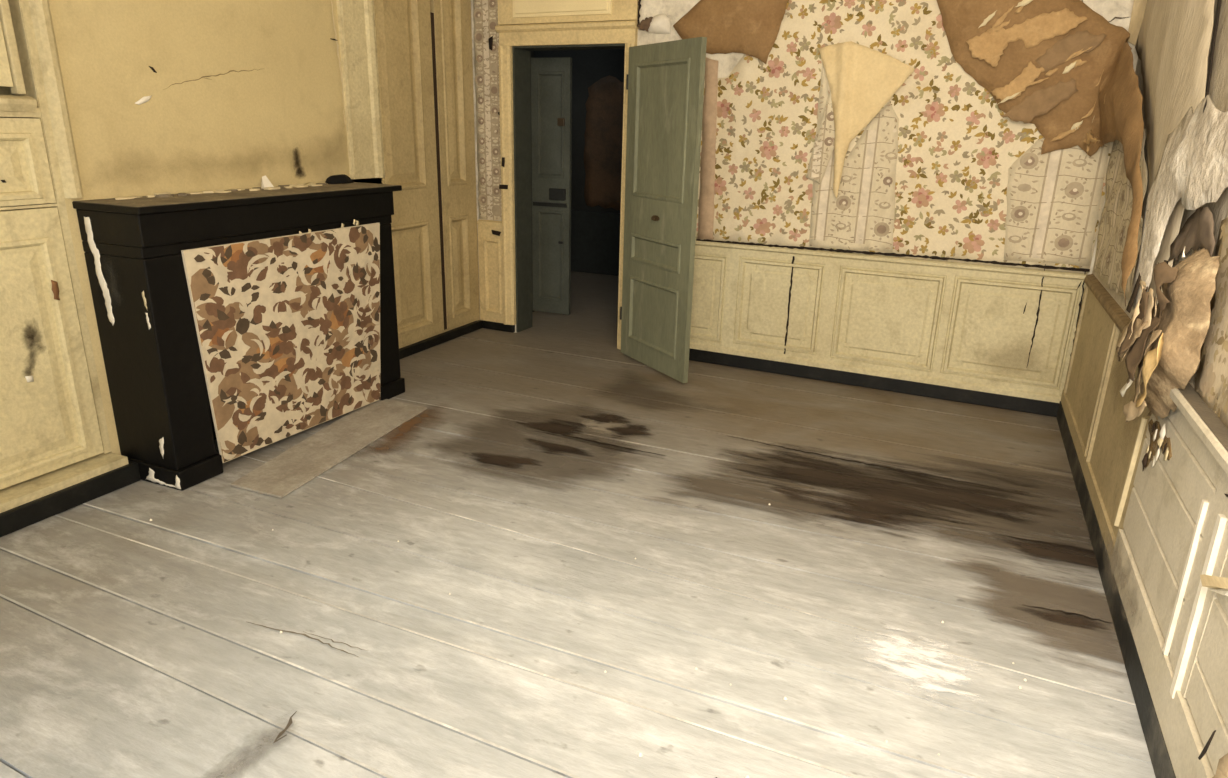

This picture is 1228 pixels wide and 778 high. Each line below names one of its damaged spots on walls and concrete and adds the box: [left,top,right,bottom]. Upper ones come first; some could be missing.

crack [166,69,260,89]
flaking render [1125,95,1228,312]
peeling [84,217,115,325]
crack [696,239,1090,366]
water stain [442,409,649,480]
peeling [1142,419,1172,471]
water stain [677,445,1126,588]
water stain [960,563,1125,664]